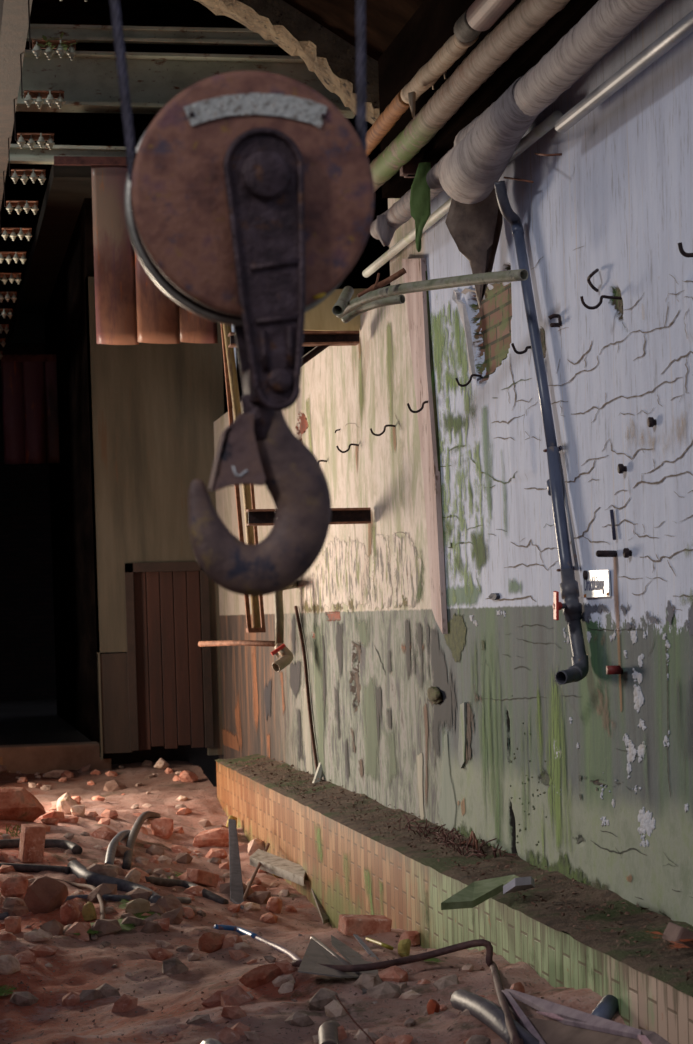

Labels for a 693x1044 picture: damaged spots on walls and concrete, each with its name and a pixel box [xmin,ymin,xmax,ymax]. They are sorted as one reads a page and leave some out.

water stain [446,310,465,390]
flaking render [452,283,512,383]
crack [440,275,693,670]
water stain [471,532,488,572]
water stain [334,616,369,781]
water stain [362,679,397,785]
crack [483,694,582,702]
peeling [578,628,647,826]
water stain [416,753,424,820]
water stain [438,733,456,831]
peeling [637,807,656,847]